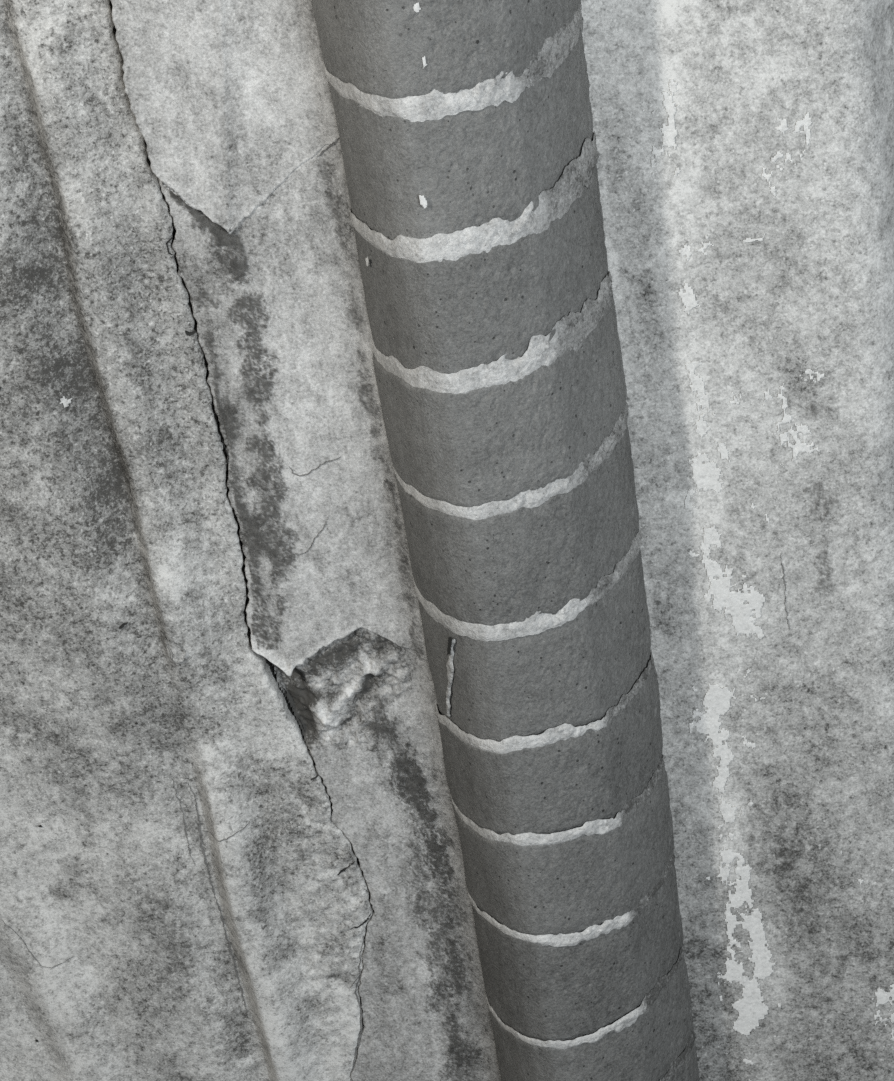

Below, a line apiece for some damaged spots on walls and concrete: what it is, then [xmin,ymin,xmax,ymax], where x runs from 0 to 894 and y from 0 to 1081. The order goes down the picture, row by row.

crack [109,0,124,72]
water stain [162,181,297,650]
crack [144,139,336,816]
spalling [272,627,414,752]
crack [173,781,252,1011]
crack [338,843,374,1081]
water stain [363,698,480,1081]
peeling [689,684,781,1037]
peeling [872,984,894,1041]